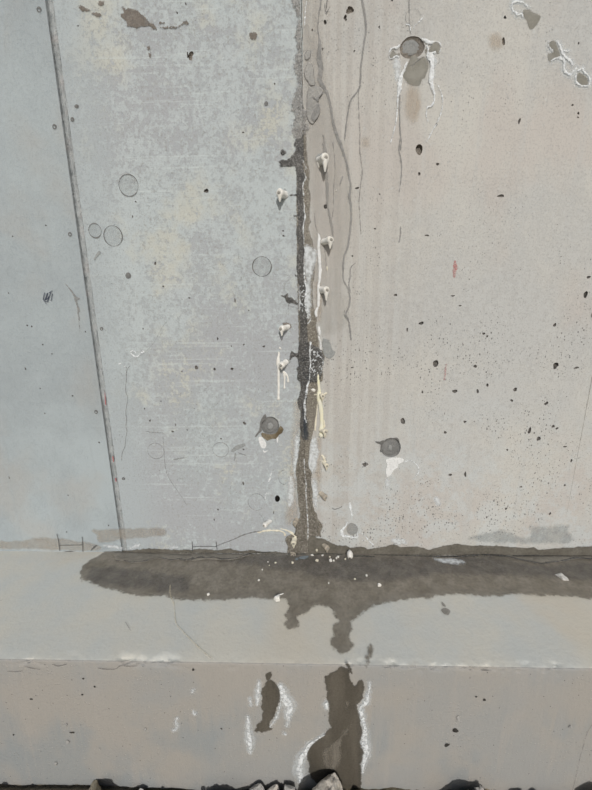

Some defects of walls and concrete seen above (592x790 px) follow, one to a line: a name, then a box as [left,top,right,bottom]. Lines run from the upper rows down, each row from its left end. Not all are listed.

water stain [80,130,592,653]
water stain [246,672,293,754]
water stain [296,664,371,789]